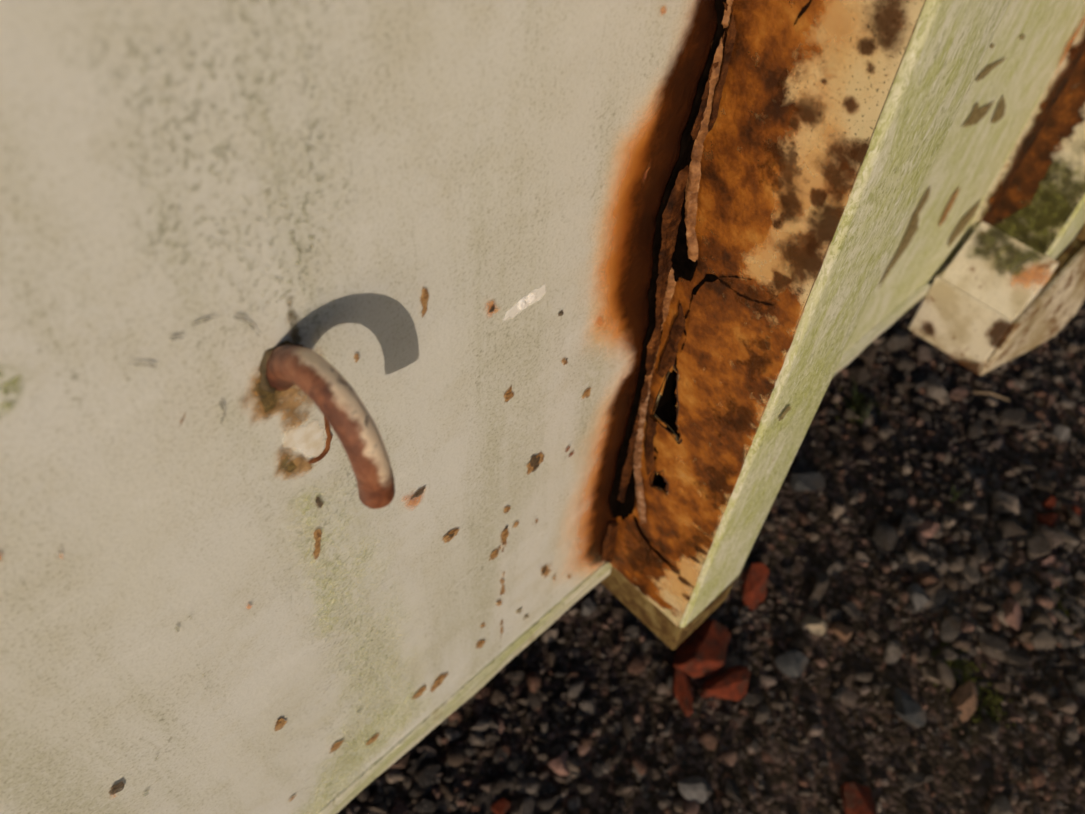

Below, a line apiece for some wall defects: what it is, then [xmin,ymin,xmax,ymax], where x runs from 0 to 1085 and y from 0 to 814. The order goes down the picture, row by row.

crack [794,0,812,25]
peeling [962,96,1006,127]
peeling [976,58,1005,81]
rust [980,18,1085,227]
crack [602,0,771,568]
rust [580,0,869,614]
peeling [878,186,931,289]
peeling [939,188,980,247]
damp [989,160,1085,256]
rust [246,378,332,478]